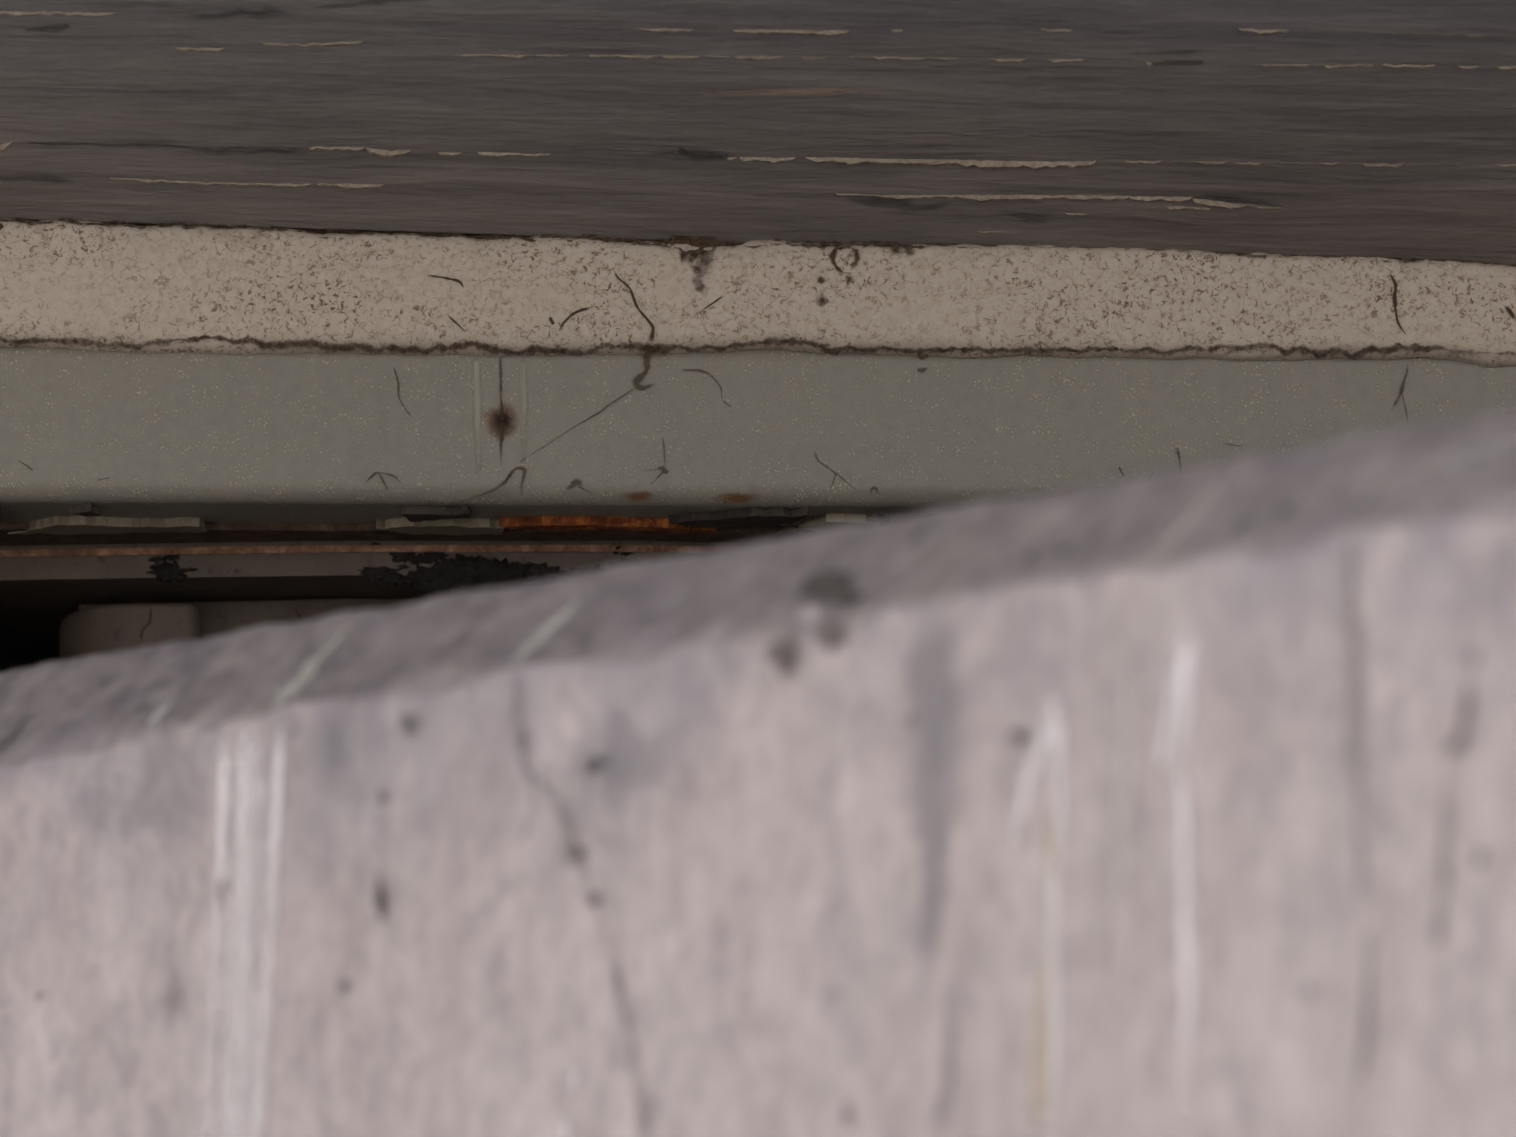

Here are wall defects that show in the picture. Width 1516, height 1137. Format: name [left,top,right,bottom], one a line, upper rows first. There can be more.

corrosion [490,409,513,435]
leakage [217,736,283,904]